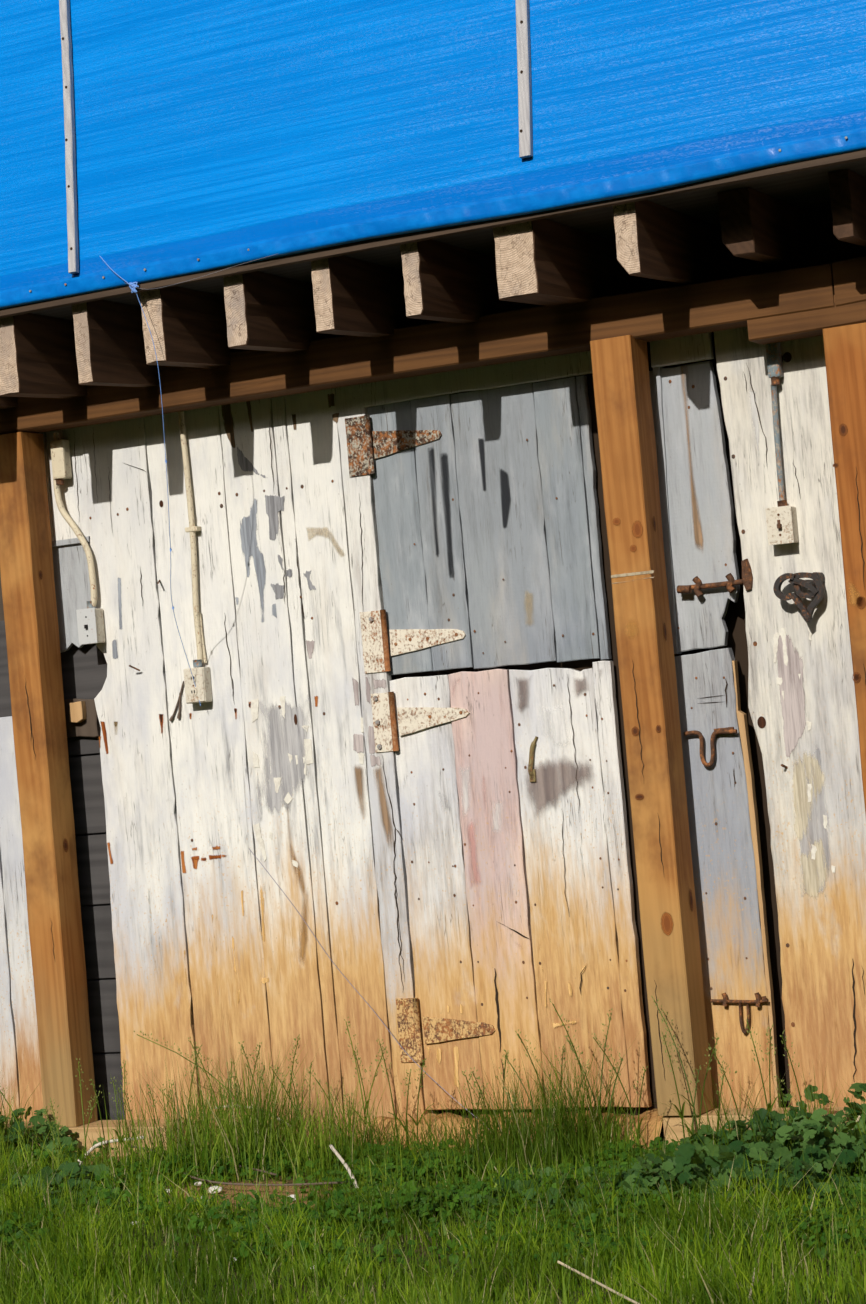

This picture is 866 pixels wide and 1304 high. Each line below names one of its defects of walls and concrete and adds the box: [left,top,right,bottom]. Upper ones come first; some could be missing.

crack [697,678,728,707]